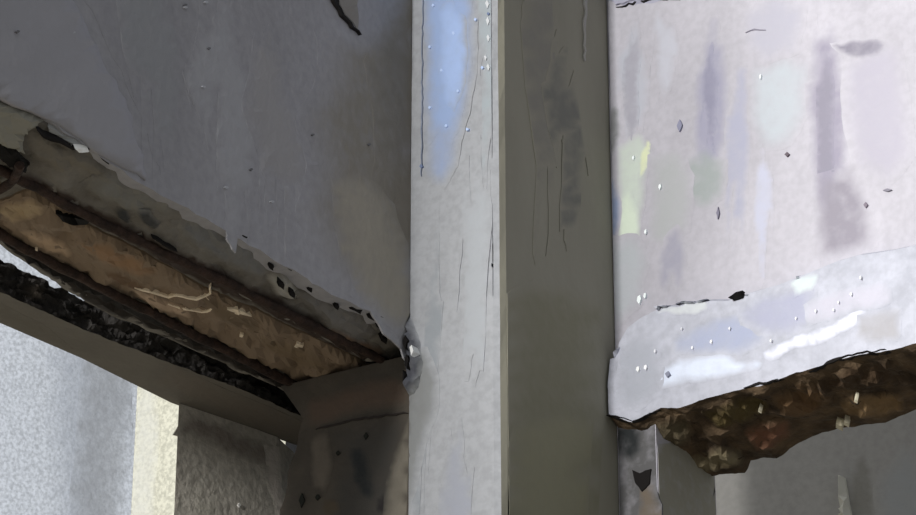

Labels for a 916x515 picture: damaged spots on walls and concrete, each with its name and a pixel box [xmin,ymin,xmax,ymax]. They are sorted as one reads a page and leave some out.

crack [330,0,362,36]
peeling [339,0,359,29]
crack [616,0,667,8]
water stain [520,0,589,265]
spalling [0,101,389,386]
water stain [607,0,916,412]
spalling [371,315,423,396]